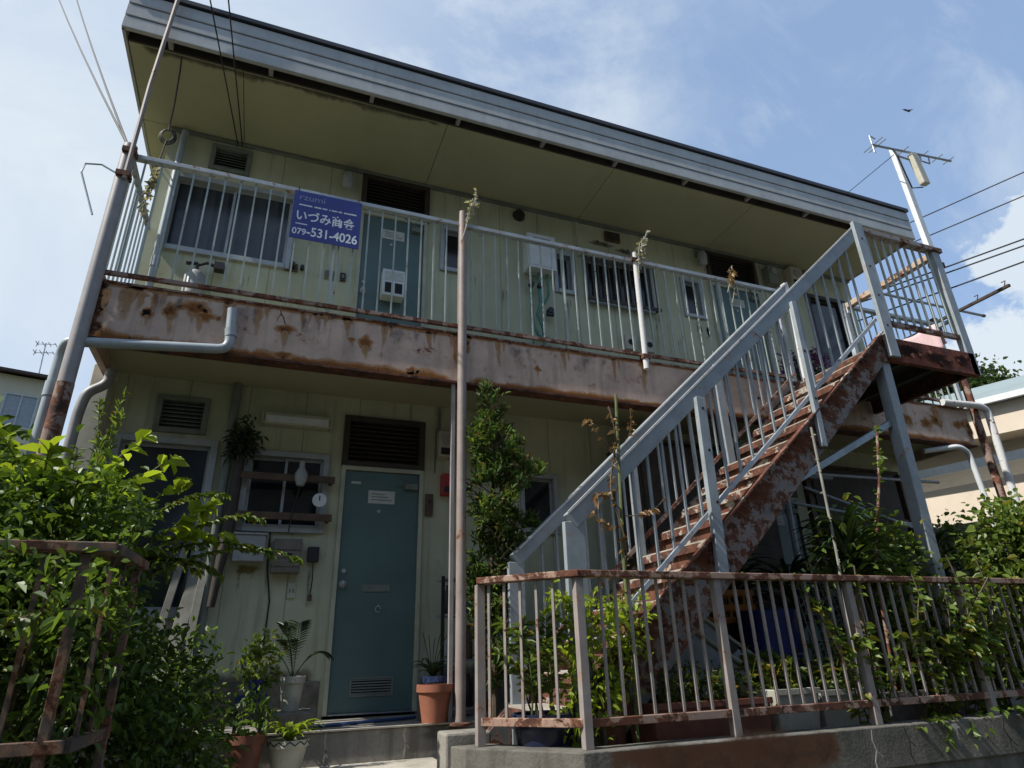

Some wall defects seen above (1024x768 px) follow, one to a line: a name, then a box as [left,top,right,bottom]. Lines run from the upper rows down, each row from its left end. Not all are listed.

rust [88,281,696,387]
rust [850,353,877,378]
rust [898,345,971,367]
rust [471,366,661,406]
rust [820,389,889,434]
rust [903,402,974,444]
rust [781,431,814,463]
rust [736,481,776,518]
rust [684,543,715,584]